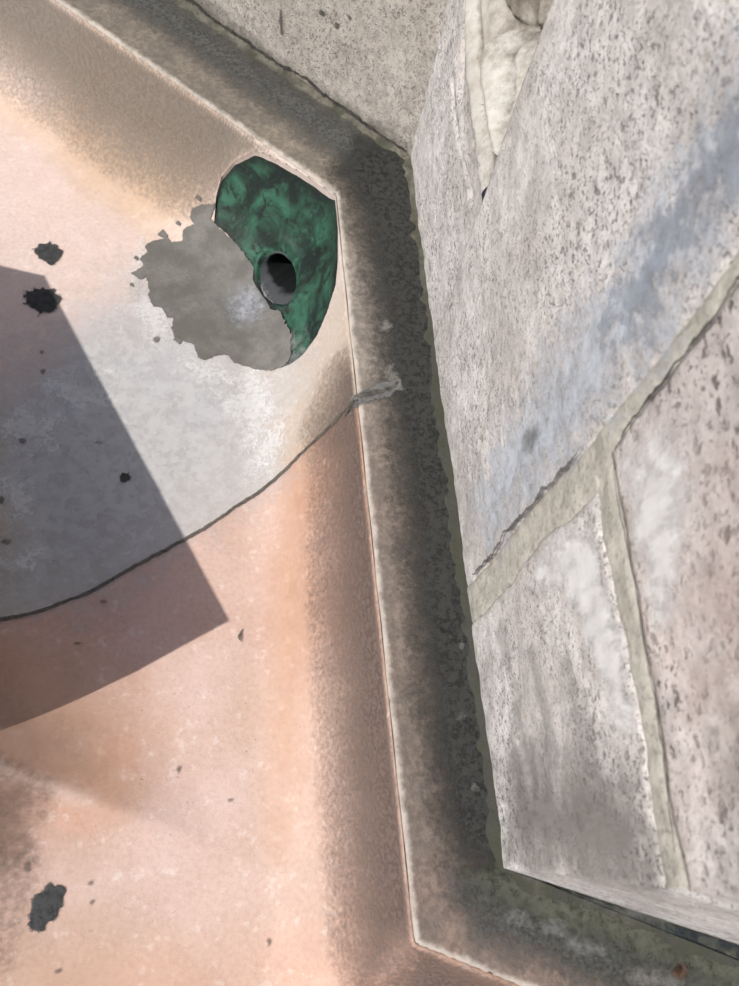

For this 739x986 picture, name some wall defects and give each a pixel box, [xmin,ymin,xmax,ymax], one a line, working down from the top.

damp [0,0,258,199]
damp [23,287,61,317]
damp [33,241,62,265]
spalling [130,194,292,371]
crack [0,379,404,621]
damp [122,0,495,870]
damp [315,361,502,986]
damp [535,537,633,727]
damp [27,883,65,933]
damp [507,783,636,879]